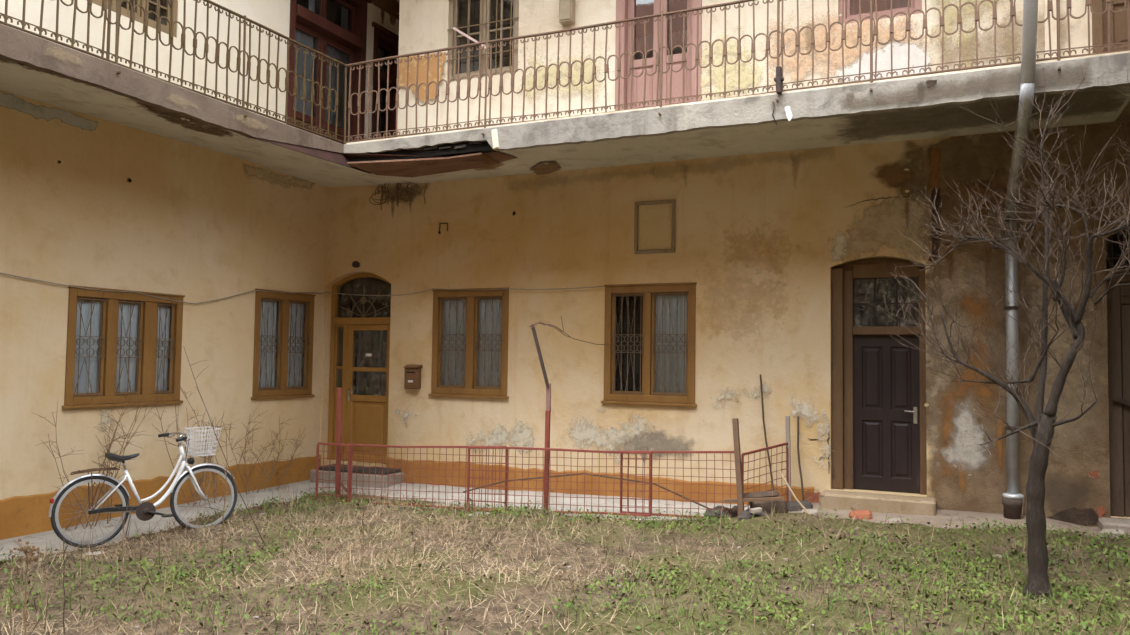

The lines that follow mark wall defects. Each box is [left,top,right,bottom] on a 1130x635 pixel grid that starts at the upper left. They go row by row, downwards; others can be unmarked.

flaking render [0,91,98,131]
damp [877,163,914,187]
damp [946,181,1007,225]
flaking render [898,121,1130,538]
peeling [792,399,834,462]